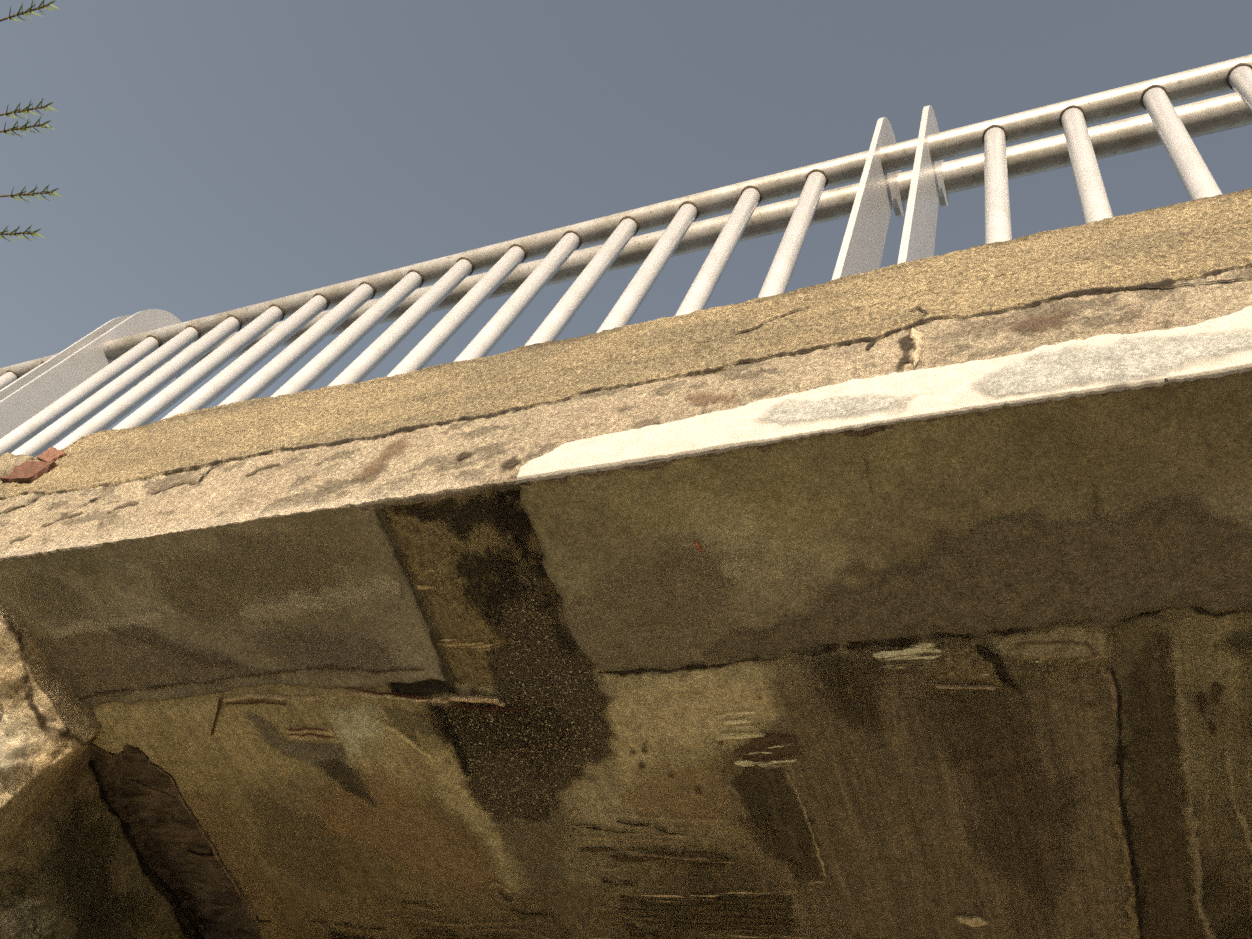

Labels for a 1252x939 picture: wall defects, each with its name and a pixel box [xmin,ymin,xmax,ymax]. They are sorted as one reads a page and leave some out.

crack [0,263,1252,516]
crack [0,617,205,939]
spalling [79,744,271,939]
crack [79,511,452,700]
water stain [248,502,1252,939]